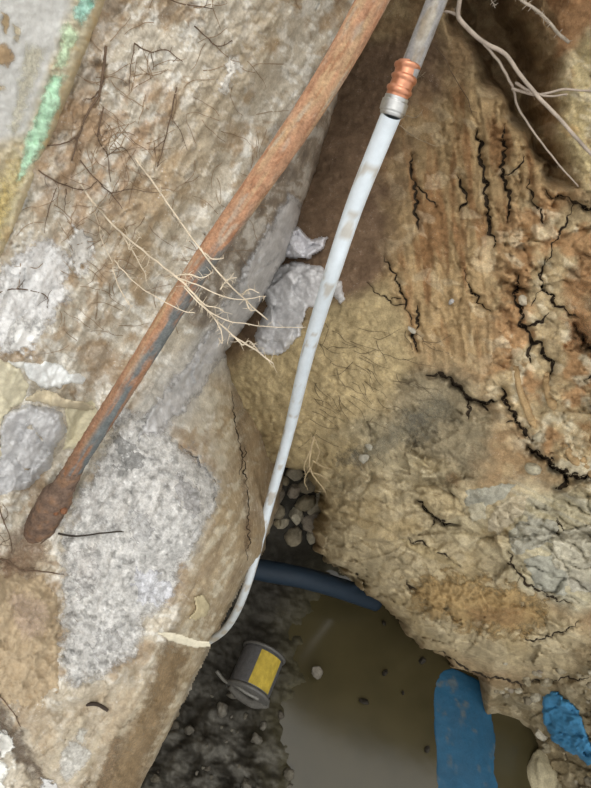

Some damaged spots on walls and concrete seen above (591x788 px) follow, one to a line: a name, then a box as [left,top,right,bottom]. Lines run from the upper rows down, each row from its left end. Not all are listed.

efflorescence [0,225,95,359]
spalling [58,408,219,688]
crack [231,391,251,561]